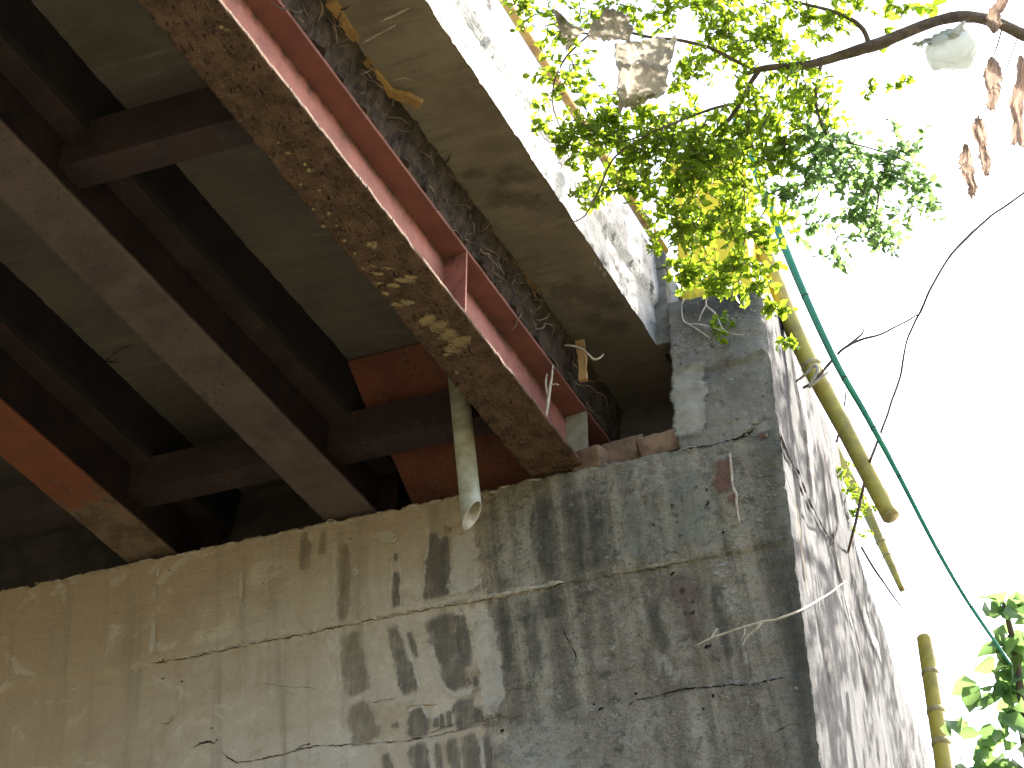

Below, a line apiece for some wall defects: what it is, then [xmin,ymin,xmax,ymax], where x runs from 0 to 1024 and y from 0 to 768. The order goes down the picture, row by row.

crack [682,425,837,565]
damp [389,554,402,607]
crack [154,556,721,664]
damp [420,533,478,599]
crack [163,715,518,763]
damp [334,633,374,742]
damp [389,613,505,768]
crack [637,676,786,700]